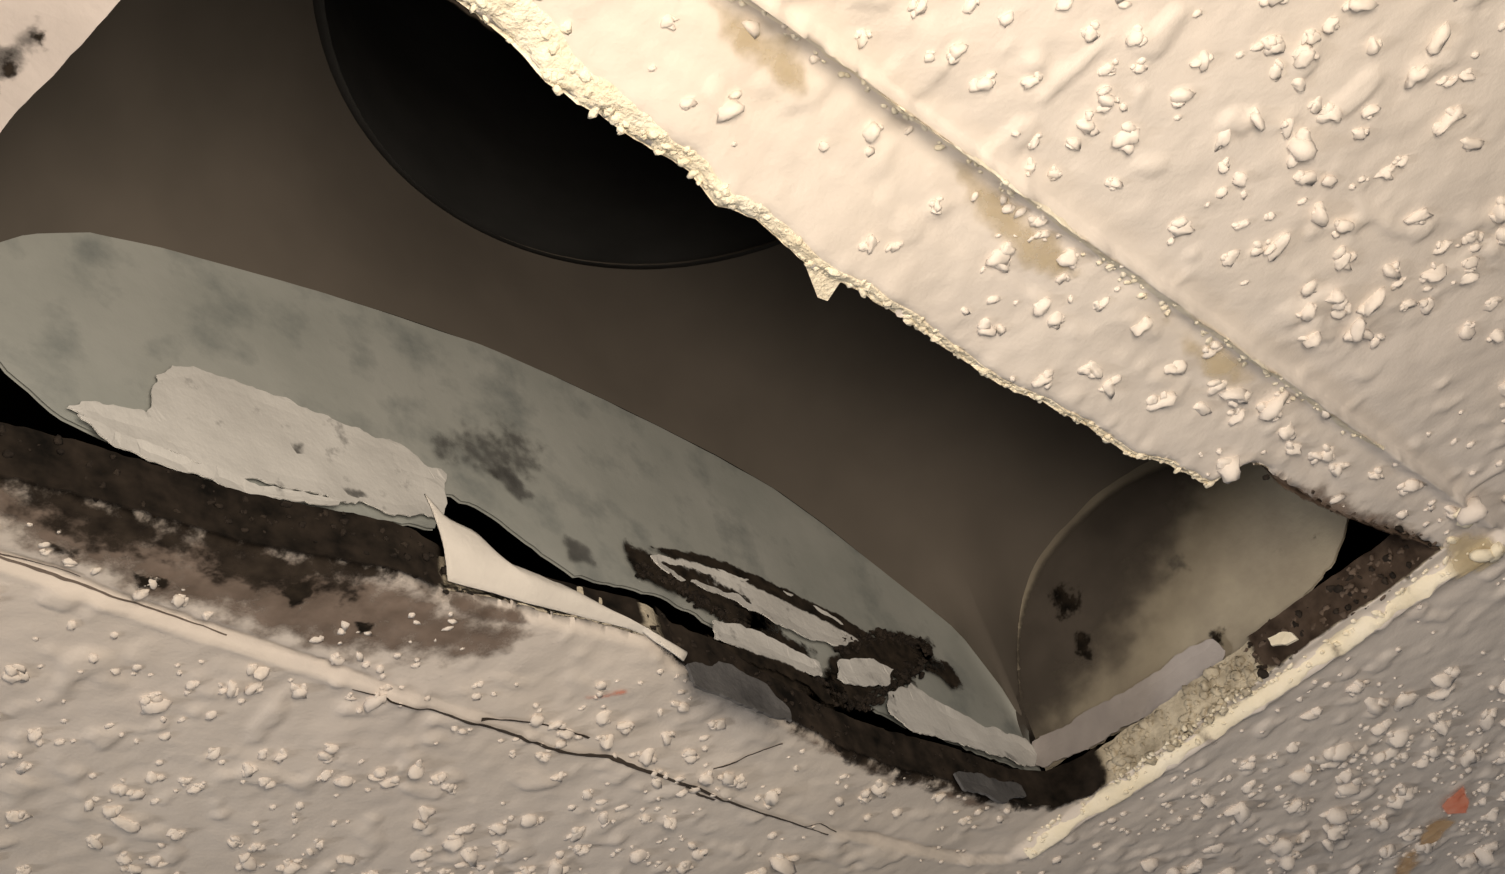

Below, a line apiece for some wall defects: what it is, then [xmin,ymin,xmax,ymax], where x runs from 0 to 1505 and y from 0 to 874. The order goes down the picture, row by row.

flaking render [457,0,1222,489]
peeling [67,365,447,518]
peeling [650,554,1263,783]
peeling [1268,632,1299,646]
corrosion [1397,787,1469,874]